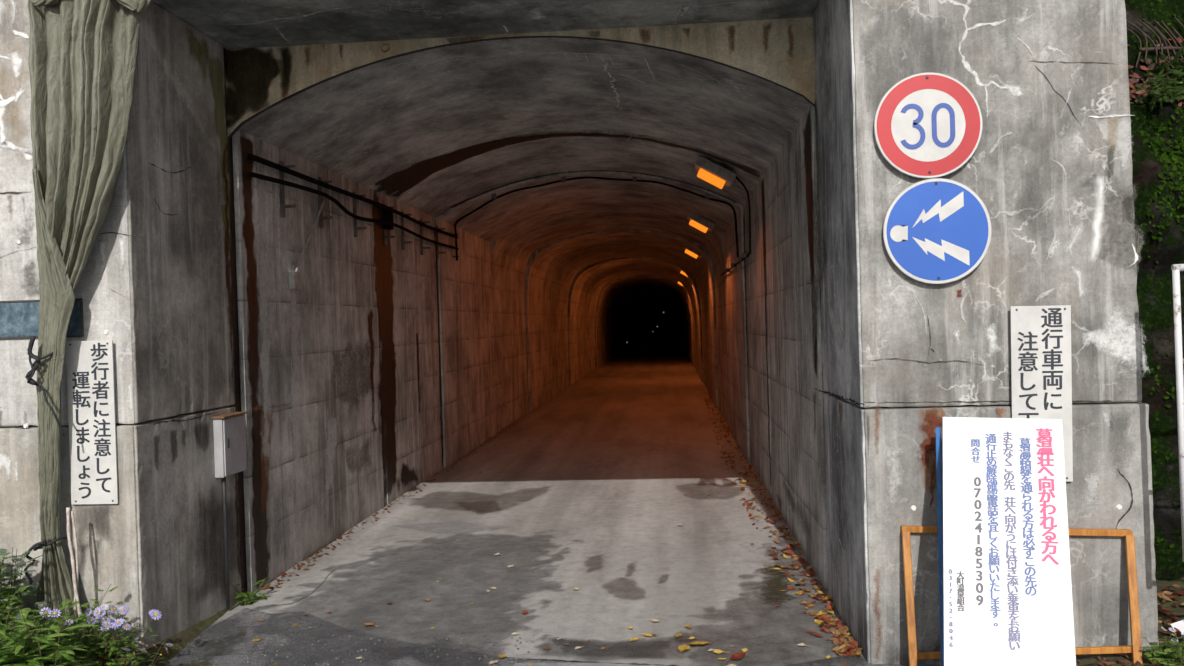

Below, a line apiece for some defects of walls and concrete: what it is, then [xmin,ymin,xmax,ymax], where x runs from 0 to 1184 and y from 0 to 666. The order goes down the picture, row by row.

crack [0,89,32,161]
damp [224,28,291,128]
crack [929,0,1119,153]
crack [991,159,1067,259]
damp [200,137,279,592]
damp [987,326,1000,356]
damp [1084,312,1147,373]
damp [155,426,209,466]
rust [920,409,945,508]